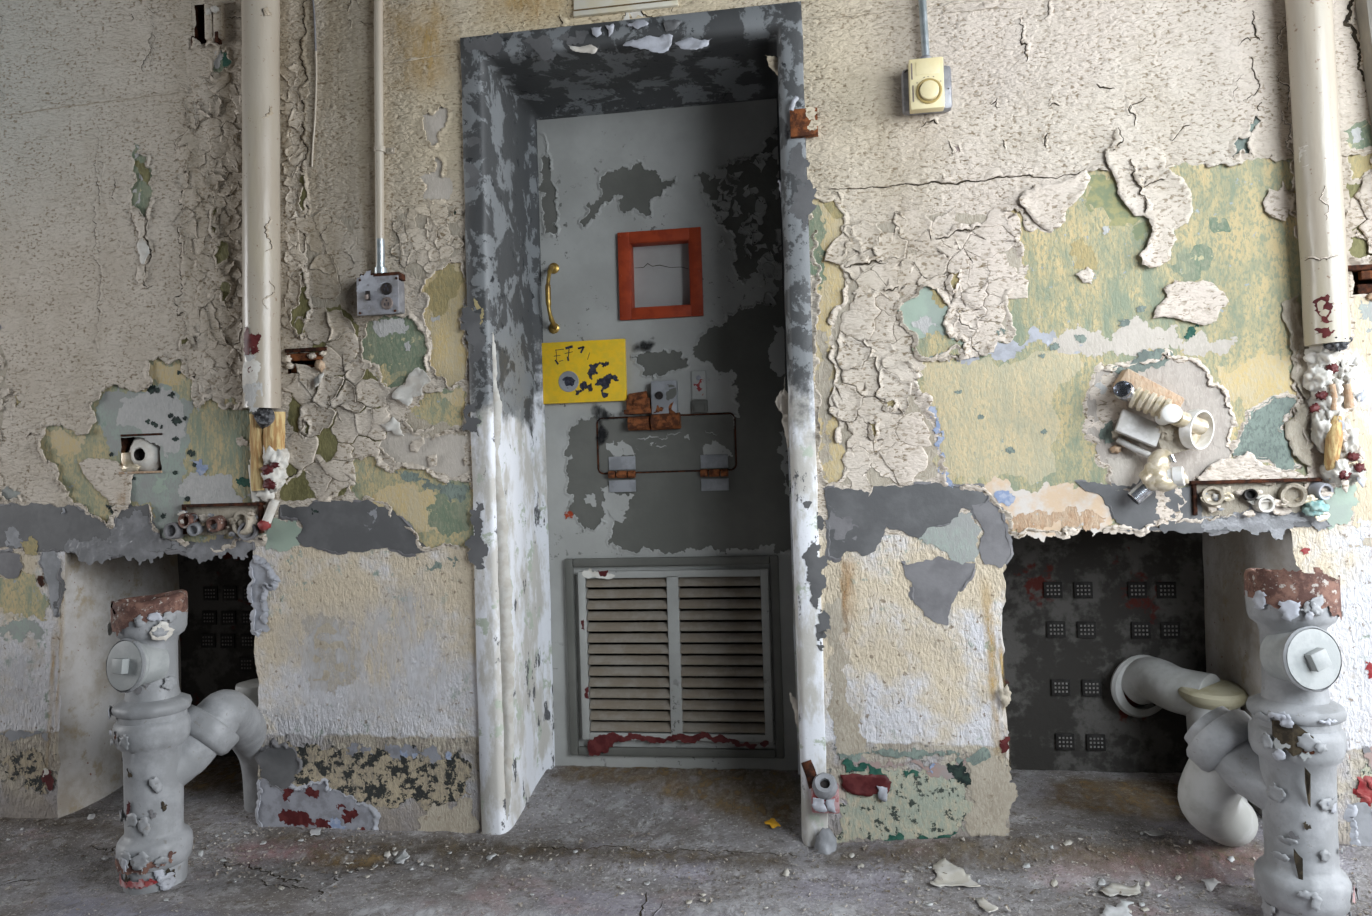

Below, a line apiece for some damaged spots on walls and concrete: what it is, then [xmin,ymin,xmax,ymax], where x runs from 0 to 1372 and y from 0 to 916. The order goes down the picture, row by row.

peeling [523,11,712,61]
peeling [767,56,778,75]
crack [262,0,459,309]
peeling [0,44,489,643]
crack [285,437,326,485]
peeling [538,111,1372,847]
peeling [0,730,54,794]
peeling [255,738,480,836]
crack [639,892,664,916]